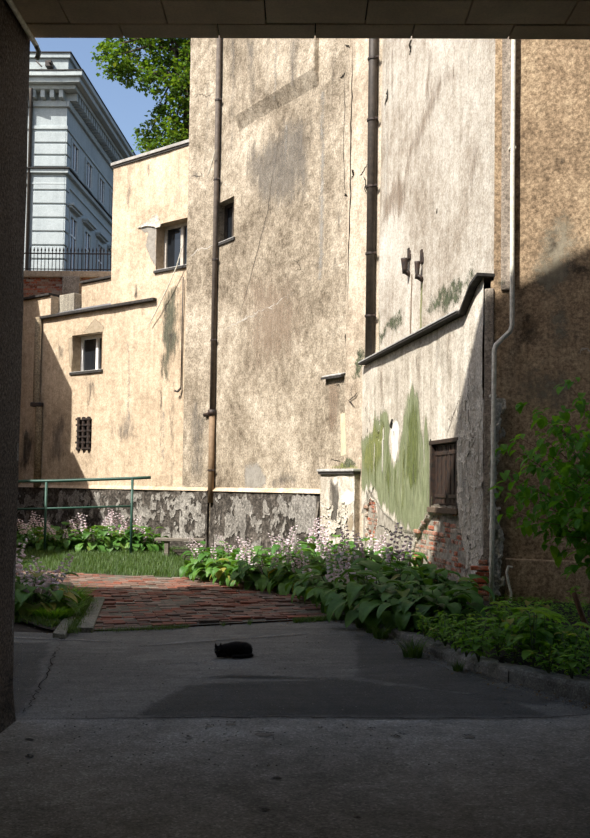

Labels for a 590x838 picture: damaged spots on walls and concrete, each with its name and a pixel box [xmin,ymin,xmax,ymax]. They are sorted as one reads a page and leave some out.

crack [340,45,367,266]
leakage [161,288,178,377]
peeling [17,375,506,601]
leakage [365,405,428,504]